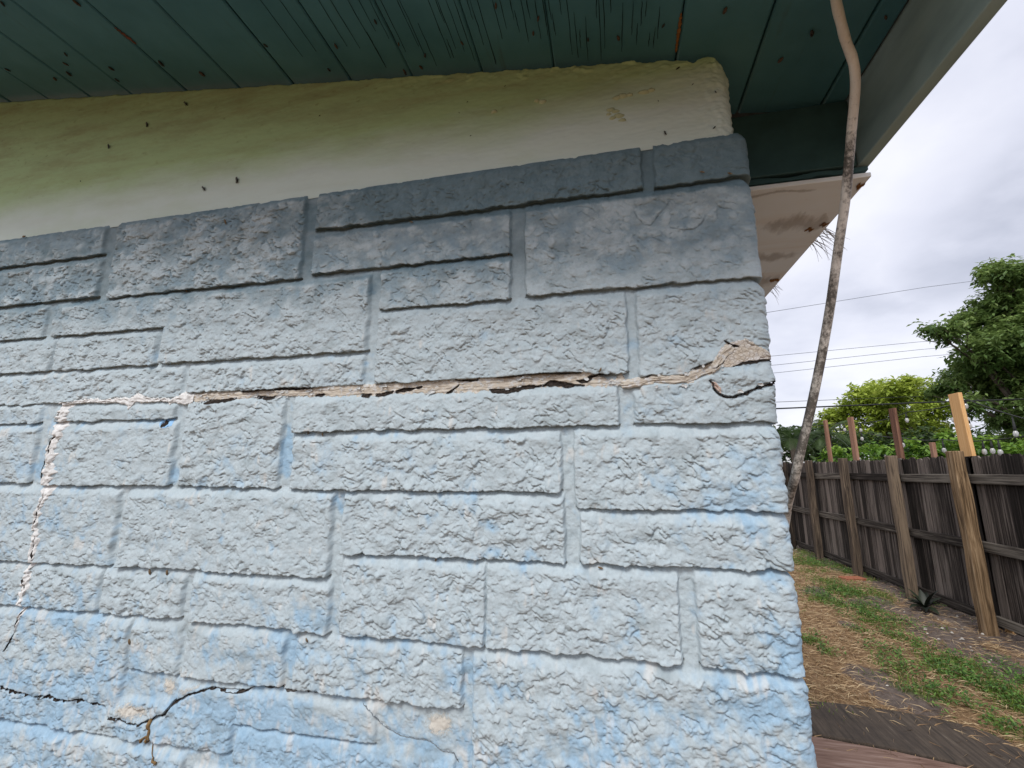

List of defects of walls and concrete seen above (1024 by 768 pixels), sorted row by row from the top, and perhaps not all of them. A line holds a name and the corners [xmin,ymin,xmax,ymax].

crack [3,365,776,652]
crack [0,685,317,727]
crack [363,703,459,762]